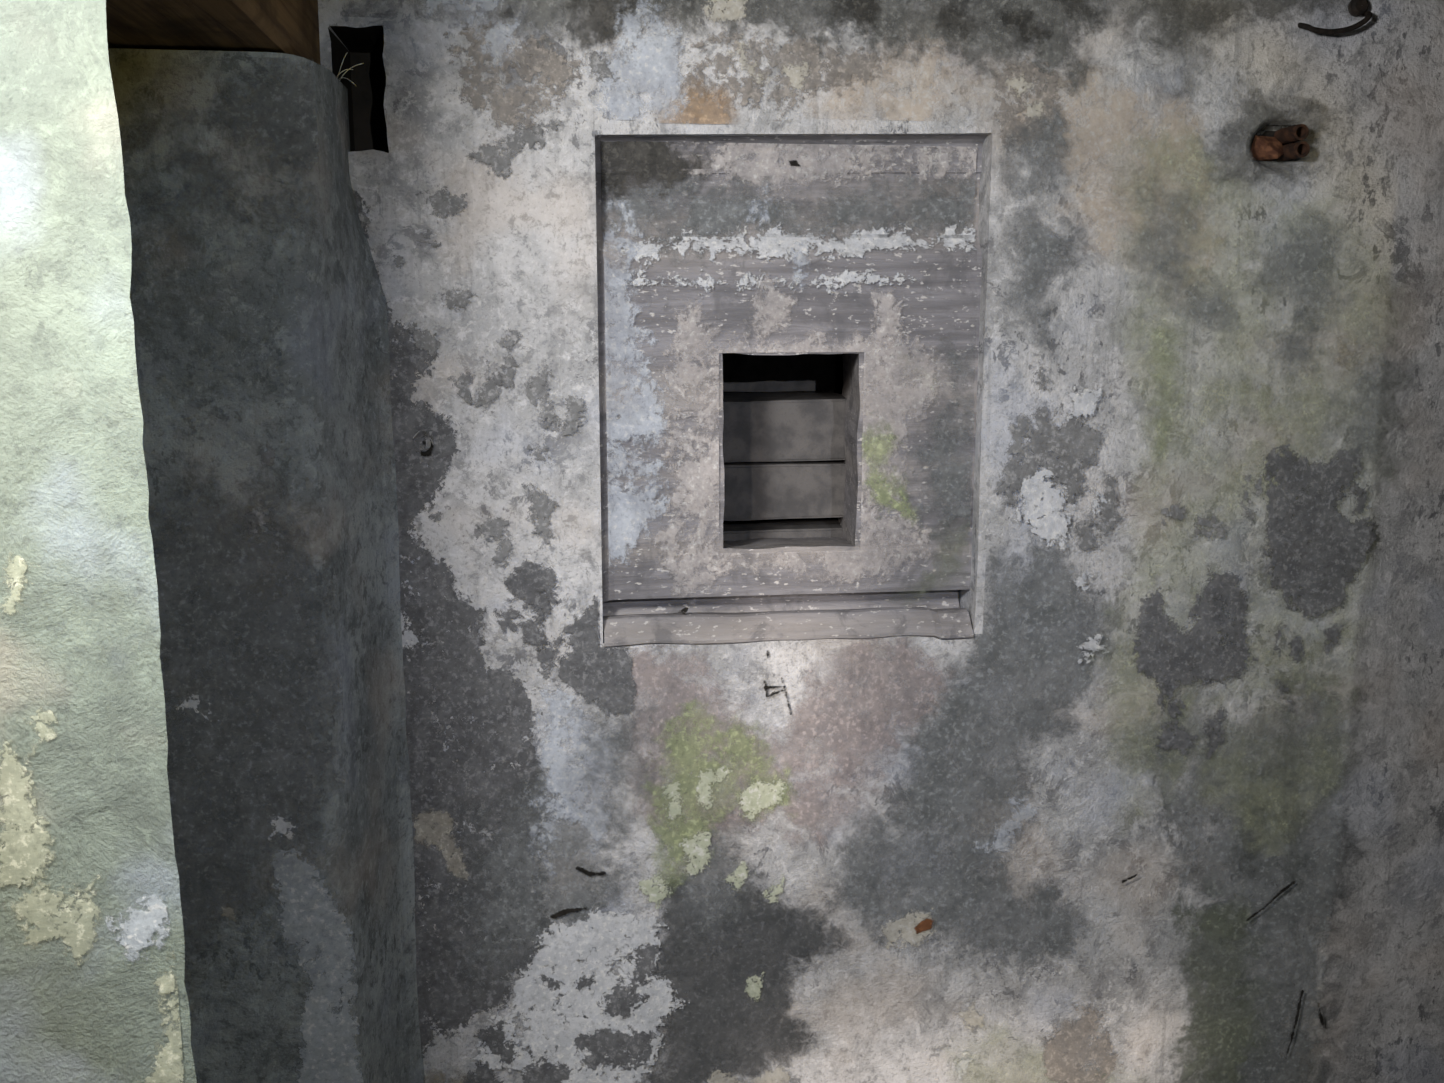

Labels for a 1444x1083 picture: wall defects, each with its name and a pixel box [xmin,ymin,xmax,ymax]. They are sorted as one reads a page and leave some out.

damp [453,546,1123,1083]